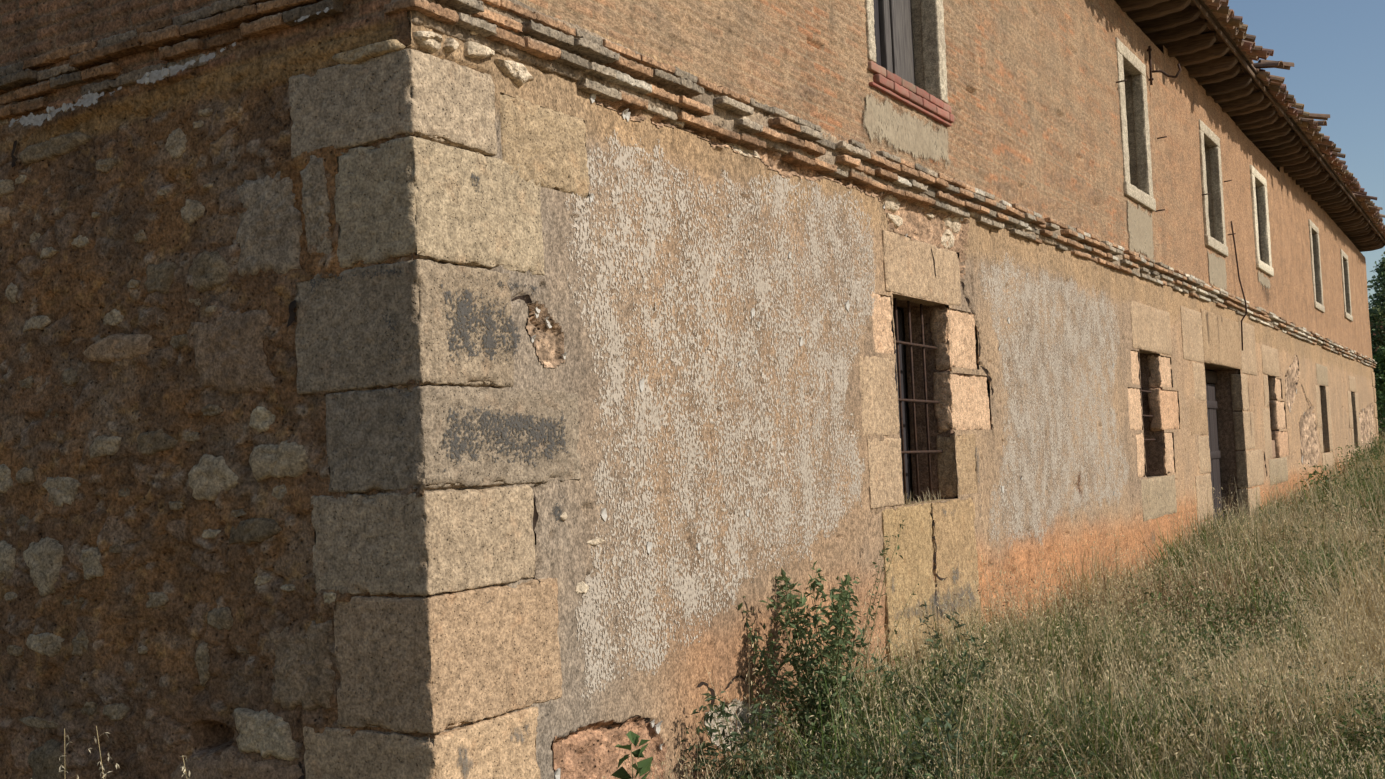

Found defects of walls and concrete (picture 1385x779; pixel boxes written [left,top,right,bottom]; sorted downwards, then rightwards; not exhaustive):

flaking render [526,301,567,368]
peeling [565,94,1129,706]
flaking render [1285,354,1320,467]
flaking render [551,716,667,779]